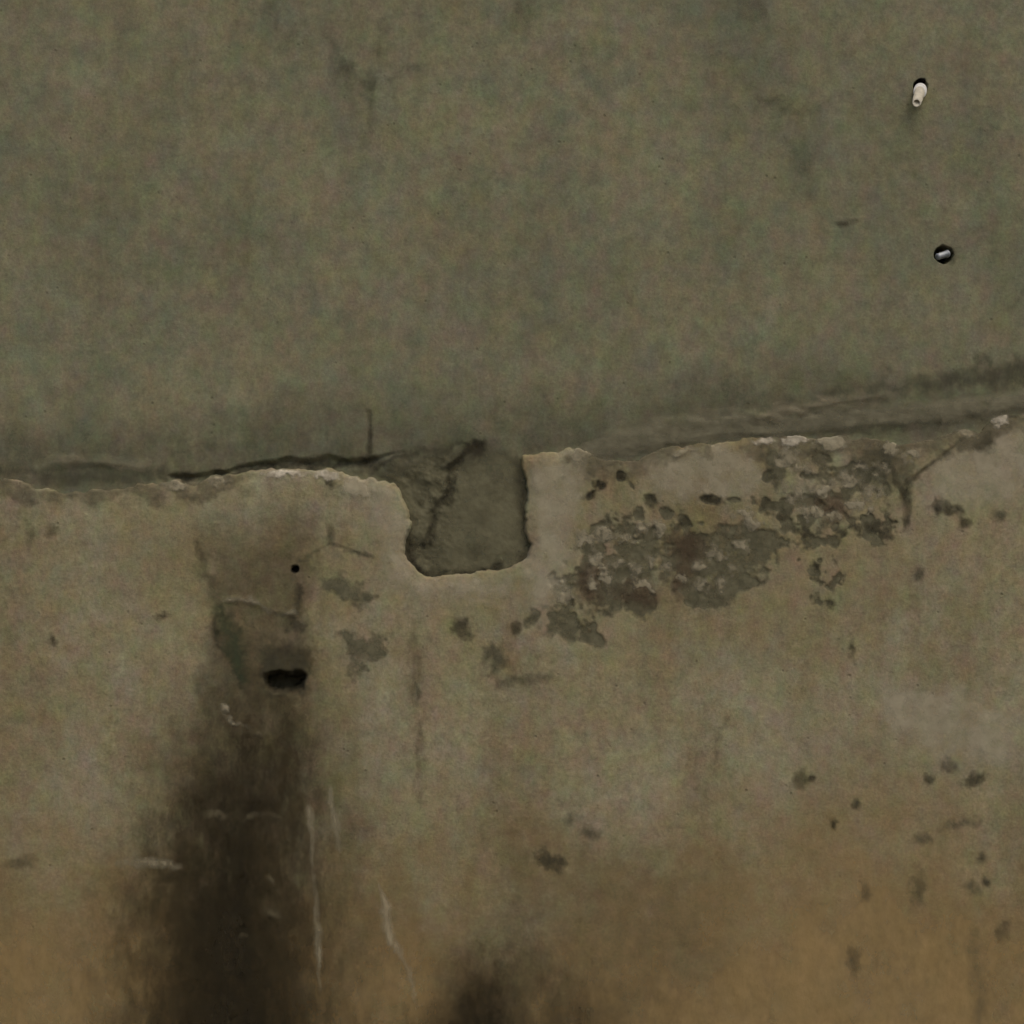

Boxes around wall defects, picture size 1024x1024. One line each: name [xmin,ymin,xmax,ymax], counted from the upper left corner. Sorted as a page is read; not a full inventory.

crack [175,429,467,482]
peeling [323,578,377,601]
peeling [339,631,386,671]
spalling [379,441,529,577]
peeling [512,435,921,648]
leakage [171,704,328,1024]